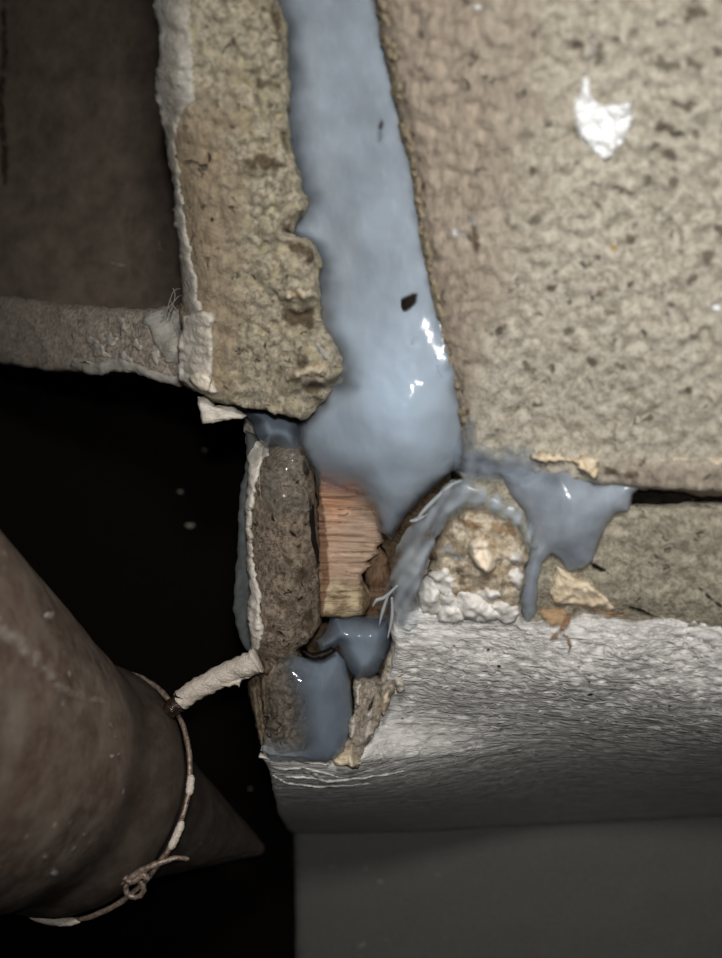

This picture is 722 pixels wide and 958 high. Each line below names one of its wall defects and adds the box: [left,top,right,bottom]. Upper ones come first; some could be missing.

crack [632,489,722,512]
spalling [247,660,288,745]
peeling [333,637,405,769]